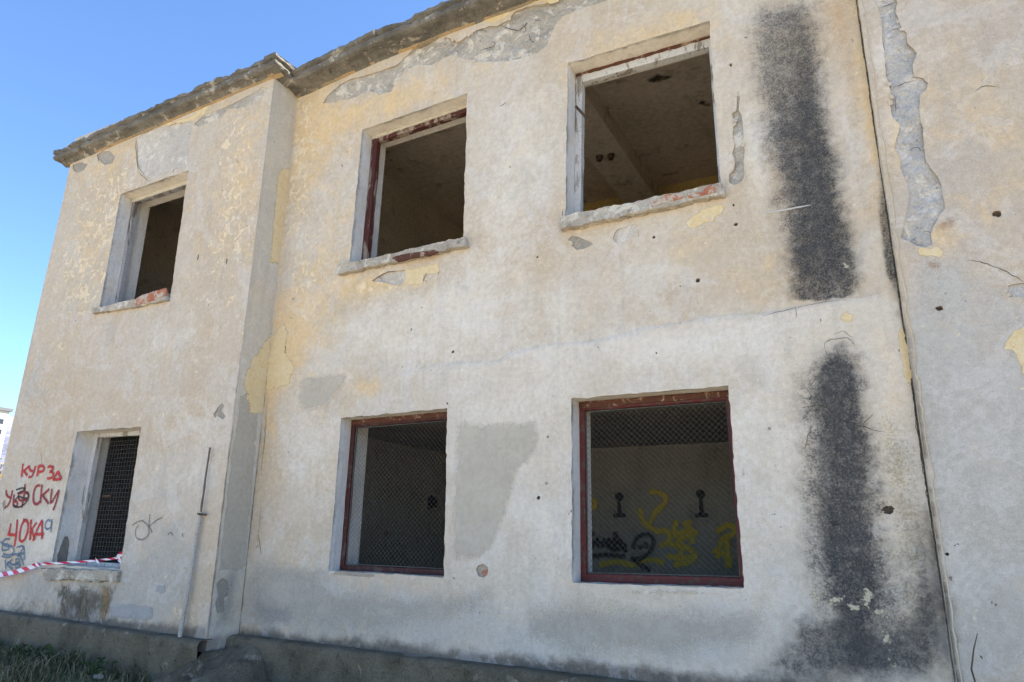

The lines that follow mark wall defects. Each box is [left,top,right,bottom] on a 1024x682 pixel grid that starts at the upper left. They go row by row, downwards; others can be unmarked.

flaking render [323,0,607,103]
flaking render [135,87,267,179]
flaking render [651,93,745,228]
leakage [759,8,857,301]
crack [856,0,916,343]
flaking render [876,0,945,257]
peeling [373,263,439,286]
peeling [244,324,294,414]
peeling [1004,327,1024,374]
leakage [778,346,936,677]
crack [911,378,955,682]